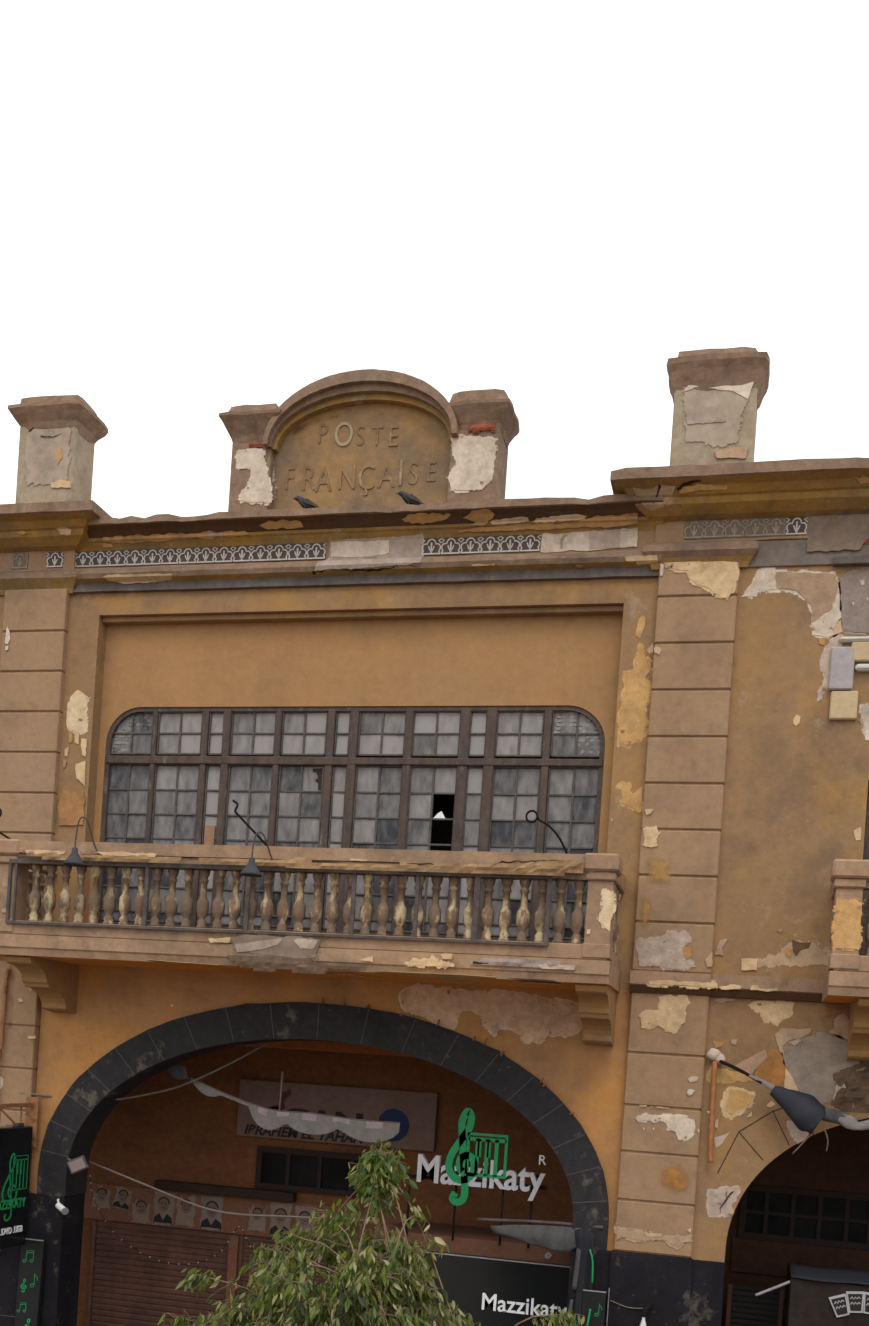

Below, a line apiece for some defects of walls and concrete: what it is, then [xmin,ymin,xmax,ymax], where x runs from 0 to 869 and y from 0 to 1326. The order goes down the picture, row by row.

peeling [103,442,303,548]
peeling [446,423,498,493]
peeling [682,382,754,459]
peeling [315,480,869,702]
peeling [58,690,90,826]
spalling [313,768,323,790]
peeling [616,615,662,749]
peeling [858,703,869,741]
spalling [22,850,584,876]
peeling [146,934,582,1045]
spalling [635,897,869,1148]